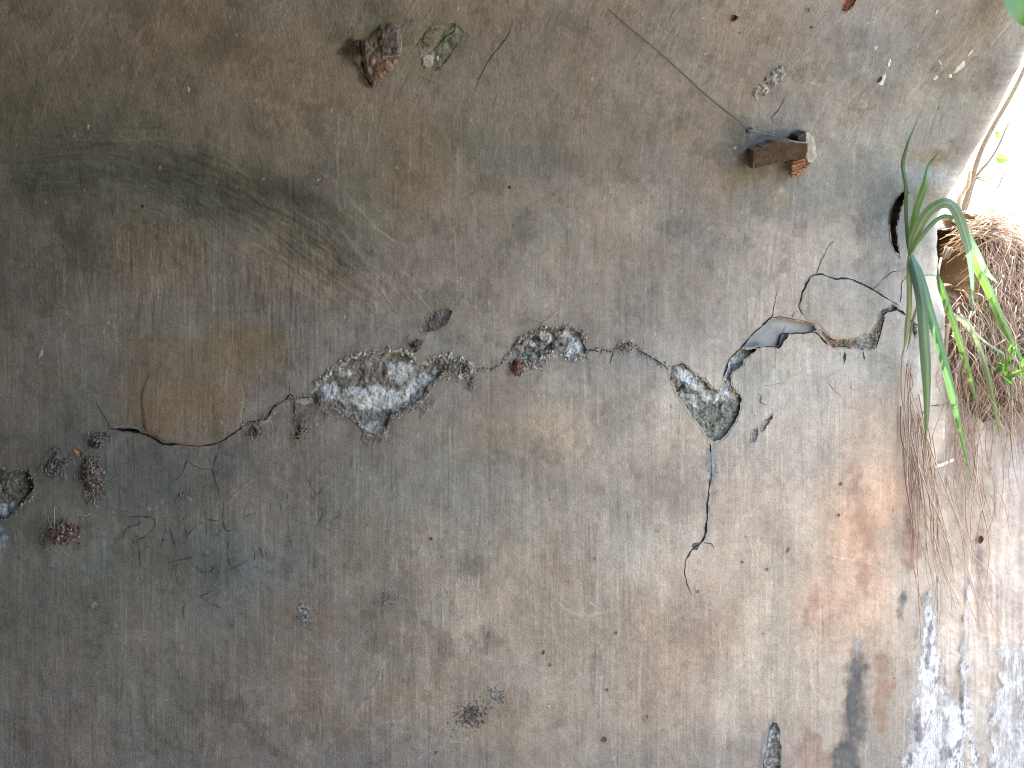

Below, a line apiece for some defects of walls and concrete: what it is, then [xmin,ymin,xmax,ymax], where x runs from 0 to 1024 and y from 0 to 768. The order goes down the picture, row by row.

crack [96,354,313,496]
flaking render [305,346,476,439]
crack [463,348,516,385]
flaking render [512,323,589,370]
crack [589,341,670,369]
flaking render [668,303,902,444]
crack [724,191,941,397]
flaking render [0,466,39,522]
crack [684,444,719,595]
flaking render [764,721,782,768]
water stain [833,658,868,768]
water stain [901,590,1024,768]